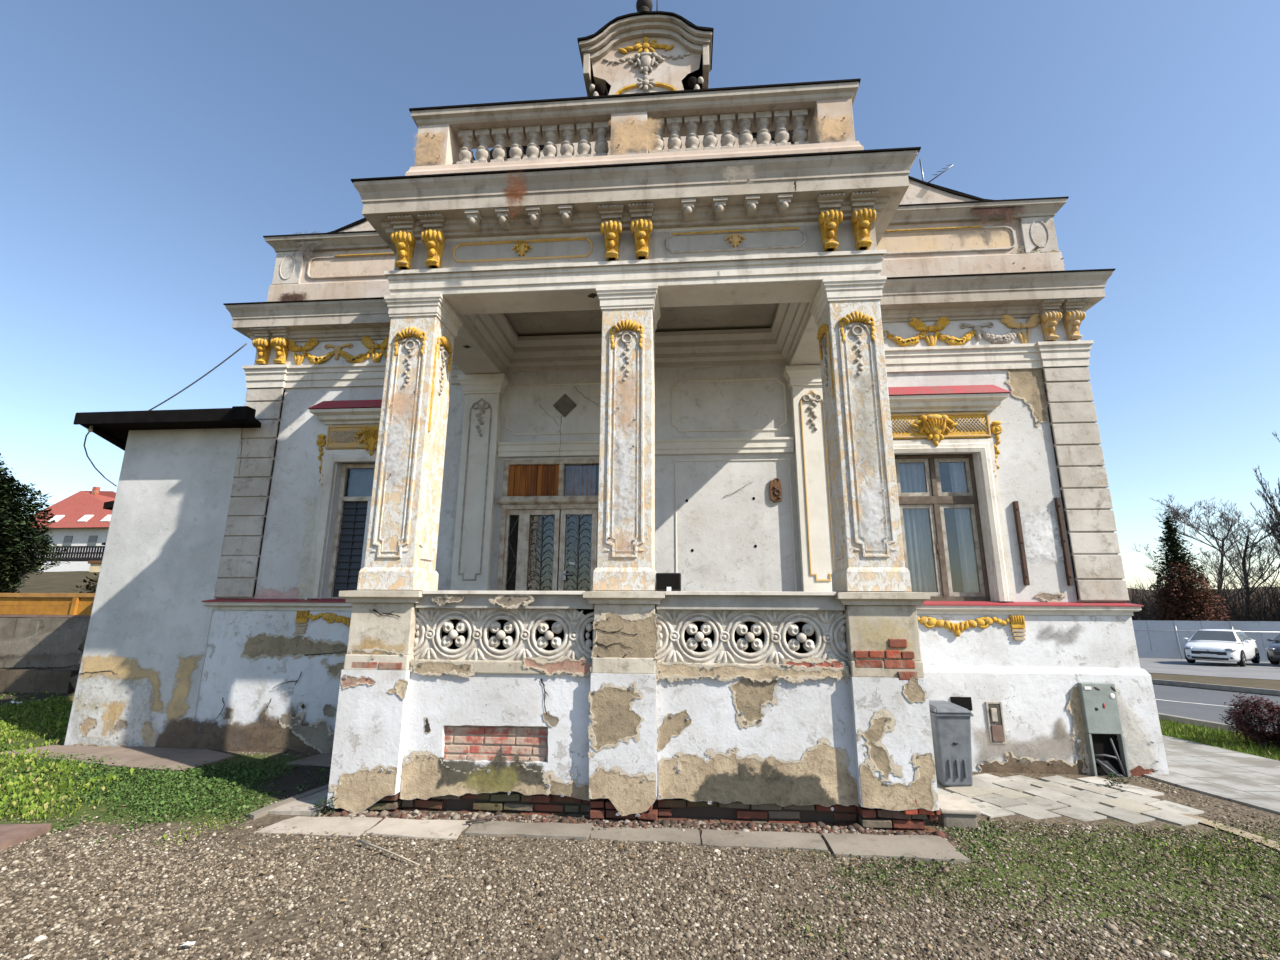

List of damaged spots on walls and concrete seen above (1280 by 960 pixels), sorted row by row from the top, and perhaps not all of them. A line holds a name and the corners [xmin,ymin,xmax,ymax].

corrosion [505,175,525,216]
peeling [1001,368,1049,427]
peeling [73,677,159,747]
leakage [0,625,321,754]
peeling [240,631,475,699]
crack [595,628,638,658]
peeling [329,610,940,832]
spalling [978,682,1091,775]
leakage [437,749,547,793]
leakage [693,761,836,807]